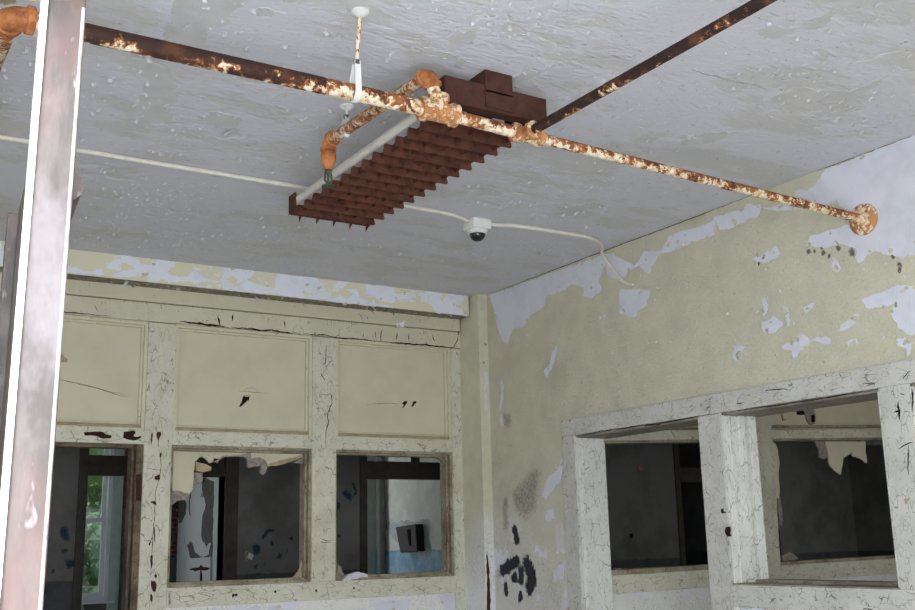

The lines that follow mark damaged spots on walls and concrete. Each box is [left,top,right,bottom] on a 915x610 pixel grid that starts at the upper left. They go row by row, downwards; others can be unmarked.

peeling [67,47,915,378]
crack [60,379,127,397]
crack [180,315,459,439]
peeling [482,361,512,428]
crack [586,383,878,435]
crack [894,371,914,420]